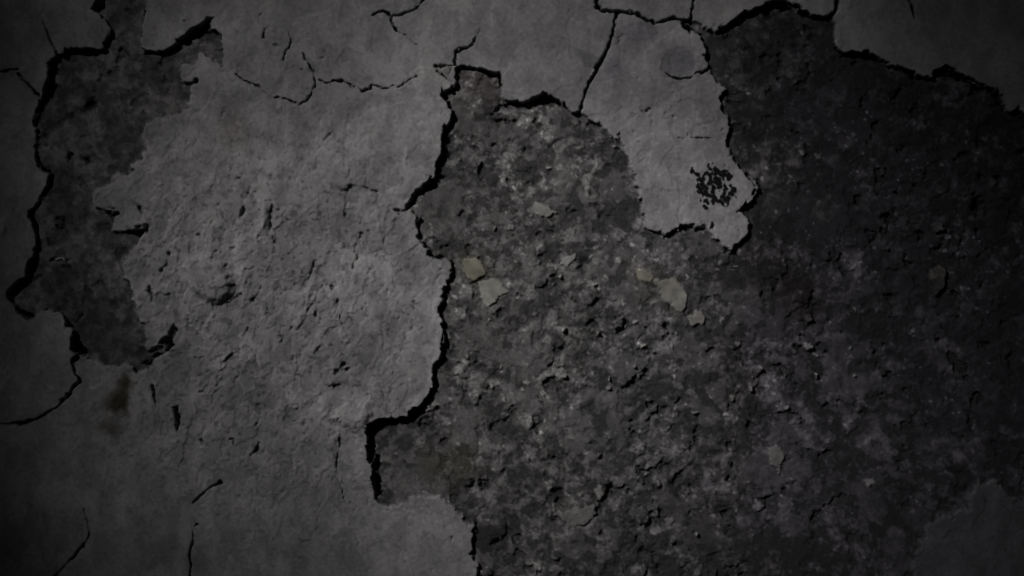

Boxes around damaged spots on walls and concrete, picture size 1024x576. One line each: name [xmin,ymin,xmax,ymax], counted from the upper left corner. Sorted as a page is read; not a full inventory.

crack [235,26,480,110]
crack [371,0,426,46]
crack [579,0,696,113]
crack [664,69,710,81]
spalling [8,0,224,372]
spalling [365,1,1024,576]
crack [0,356,83,427]